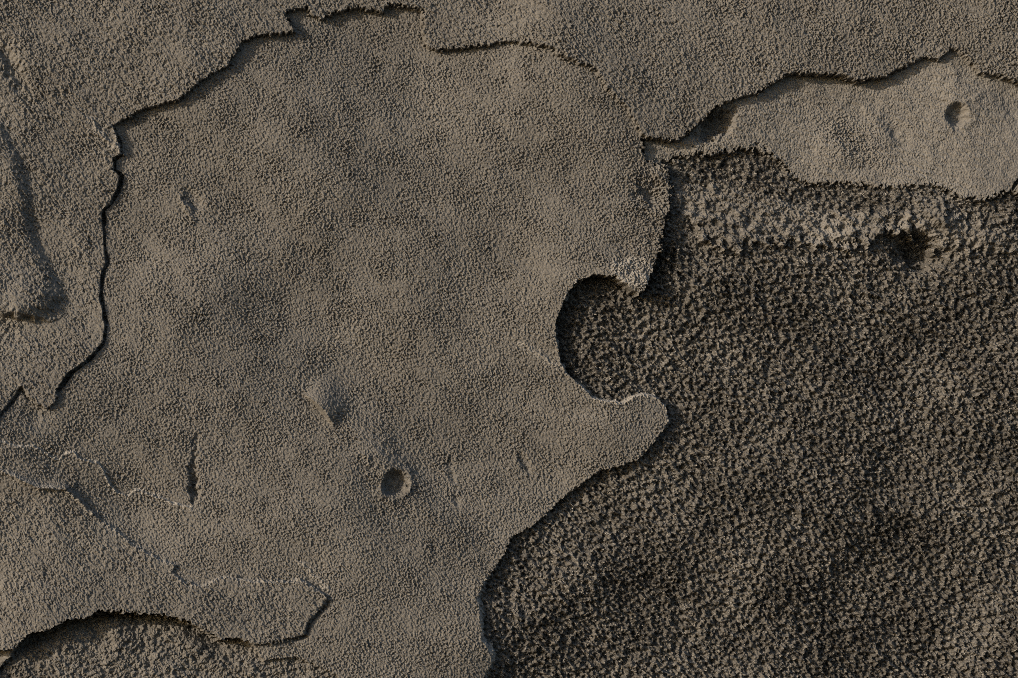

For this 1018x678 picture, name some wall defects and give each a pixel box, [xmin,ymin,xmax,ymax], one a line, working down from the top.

crack [84,116,127,157]
spalling [644,45,1018,203]
crack [1009,174,1018,194]
spalling [0,2,674,678]
spalling [476,147,1018,678]